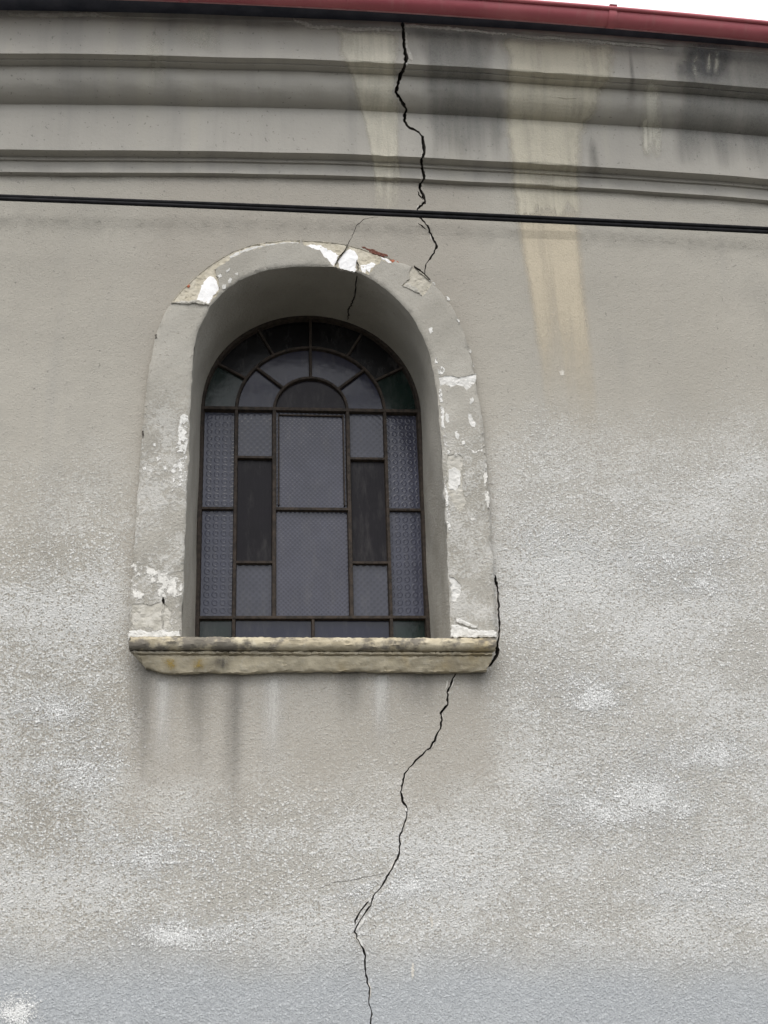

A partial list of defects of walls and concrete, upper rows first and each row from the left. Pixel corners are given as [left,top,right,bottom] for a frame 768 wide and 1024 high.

crack [394,23,438,280]
leakage [505,39,611,357]
flaking render [171,240,399,306]
crack [335,217,373,320]
flaking render [402,267,435,296]
peeling [142,414,189,494]
peeling [435,345,490,530]
peeling [128,561,183,639]
peeling [449,575,462,601]
flaking render [450,618,497,638]
crack [488,575,501,667]
crack [319,674,456,1024]